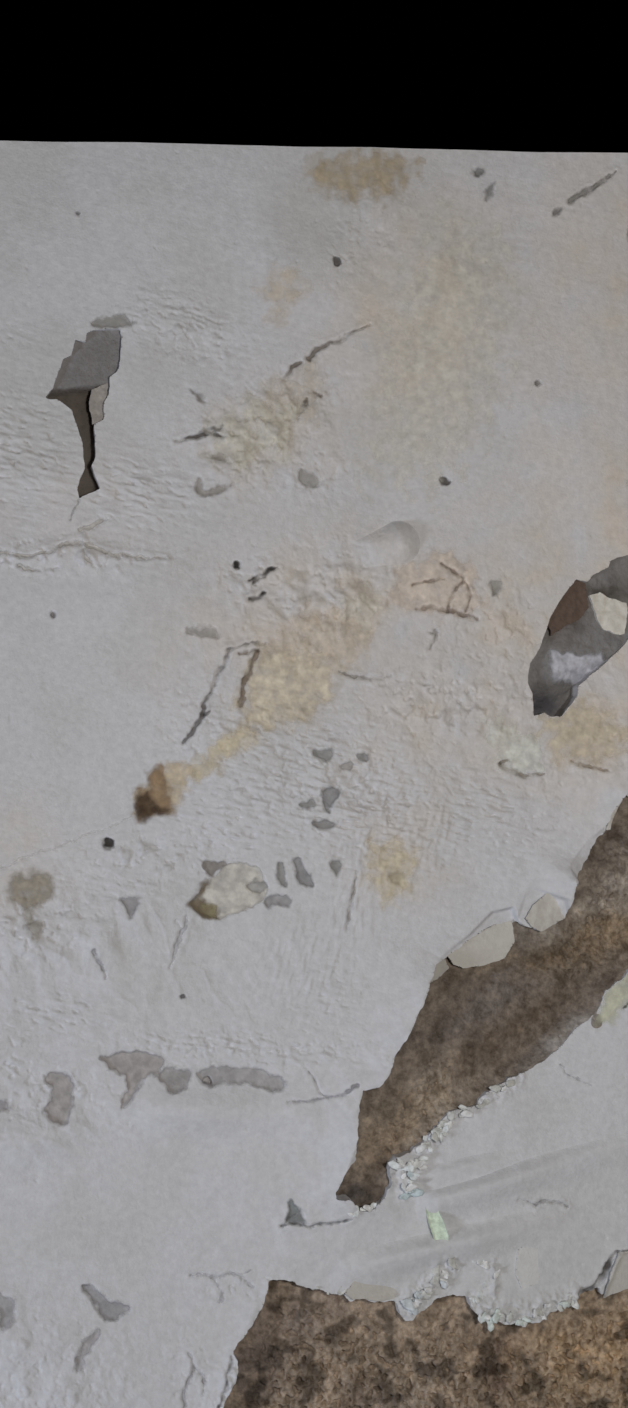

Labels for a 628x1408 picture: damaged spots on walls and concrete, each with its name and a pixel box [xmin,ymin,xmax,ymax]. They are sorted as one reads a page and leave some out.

flaking render [47,315,131,498]
flaking render [528,555,628,717]
damp [191,552,477,780]
peeling [313,750,368,770]
peeling [299,787,340,829]
peeling [121,897,137,918]
peeling [202,861,226,876]
peeling [247,857,314,907]
spalling [336,794,628,1241]
peeling [99,1050,284,1108]
peeling [286,1200,305,1224]
spalling [223,1247,628,1408]